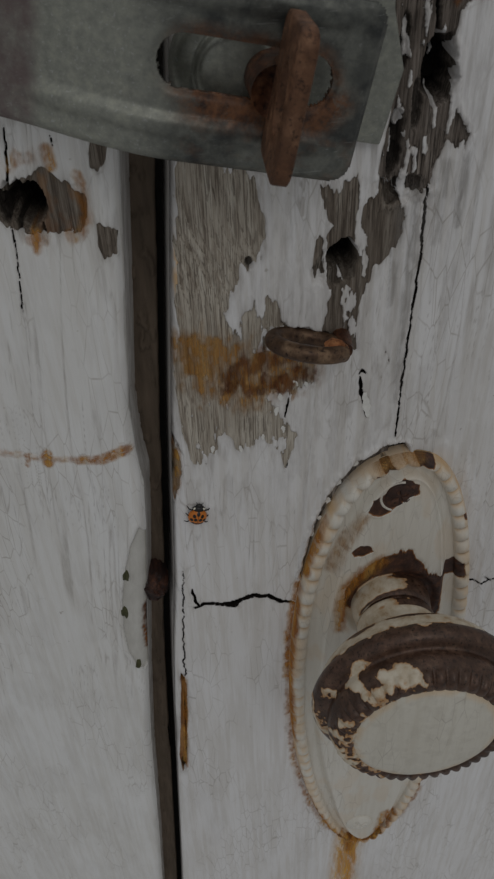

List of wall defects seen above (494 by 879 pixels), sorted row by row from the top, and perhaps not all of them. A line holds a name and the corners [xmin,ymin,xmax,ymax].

peeling [172,161,315,468]
peeling [312,174,405,350]
crack [395,182,429,437]
corrosion [171,335,316,408]
corrosion [80,447,132,463]
crack [182,574,296,675]
corrosion [285,529,322,778]
corrosion [336,558,387,631]
corrosion [303,790,396,879]